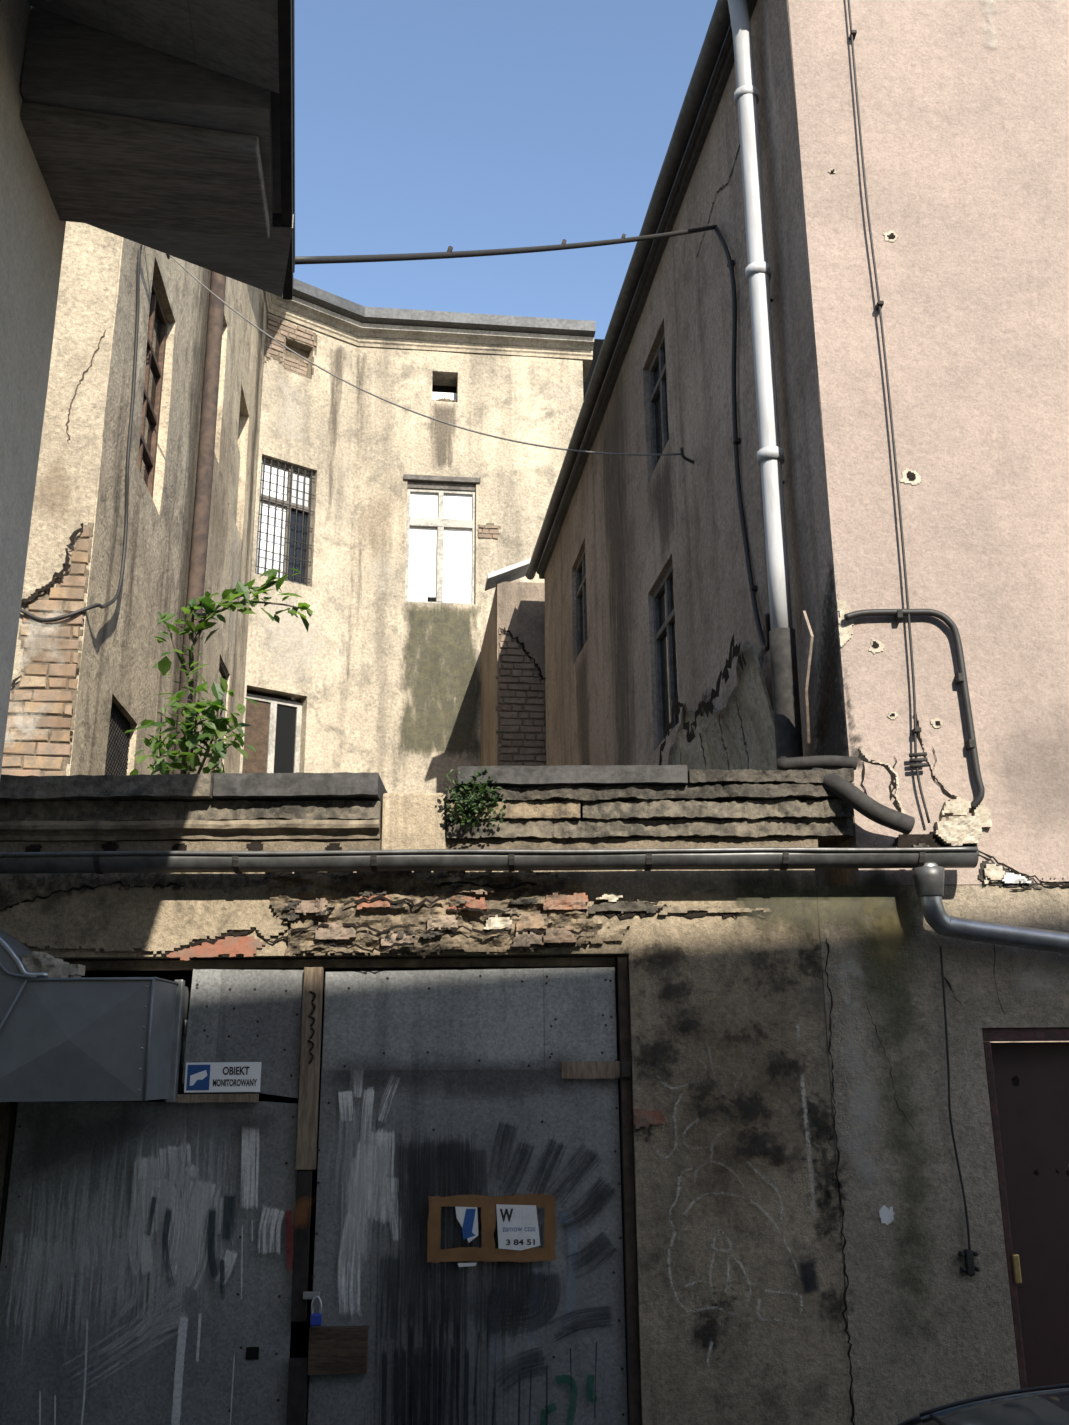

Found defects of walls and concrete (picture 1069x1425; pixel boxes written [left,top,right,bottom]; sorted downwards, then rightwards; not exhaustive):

crack [66,330,106,441]
spalling [1,522,94,776]
damp [400,605,481,757]
spalling [496,627,547,766]
peeling [659,627,777,773]
peeling [799,568,905,814]
spalling [887,712,992,848]
spalling [0,871,630,961]
damp [627,943,700,1081]
damp [689,1051,843,1245]
crack [825,939,915,1425]
damp [694,1293,736,1348]